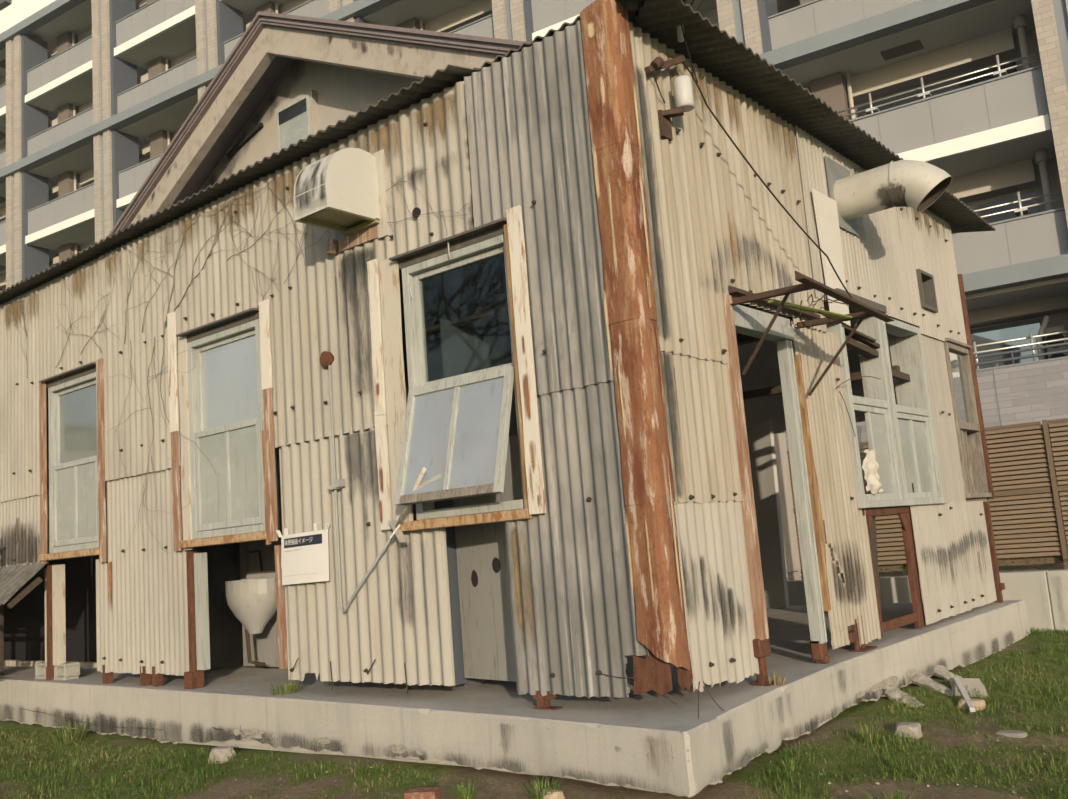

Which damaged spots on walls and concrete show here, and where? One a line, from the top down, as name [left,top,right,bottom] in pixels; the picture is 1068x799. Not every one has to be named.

water stain [335,249,374,385]
water stain [922,532,986,576]
water stain [682,558,741,632]
water stain [53,711,75,728]
water stain [95,714,237,742]
water stain [253,734,308,749]
water stain [324,741,342,752]